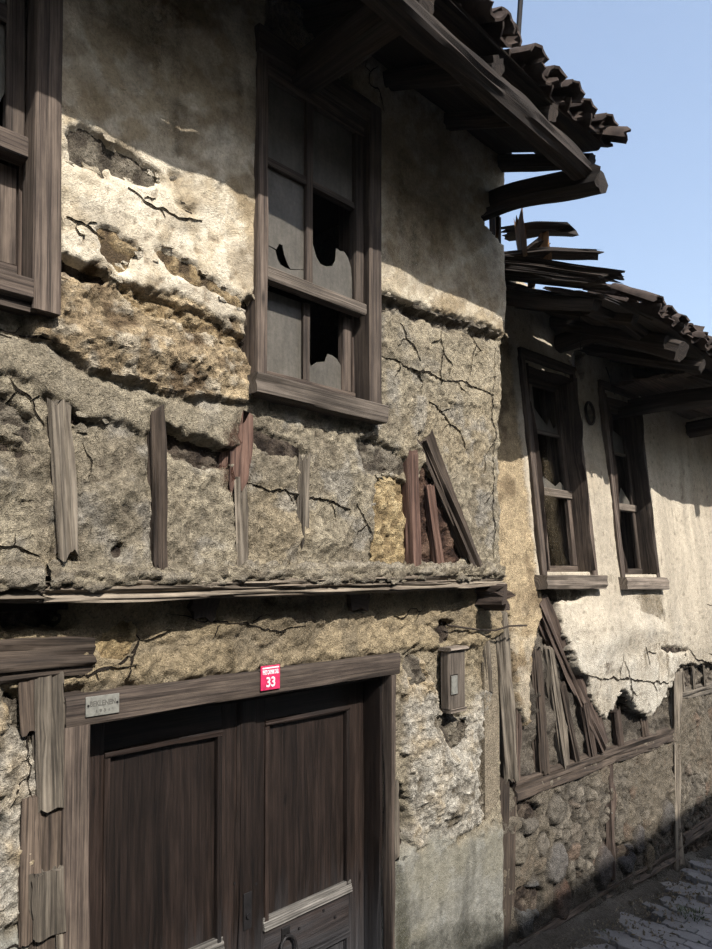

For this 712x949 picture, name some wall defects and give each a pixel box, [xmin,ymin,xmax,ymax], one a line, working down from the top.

spalling [63,128,178,187]
crack [128,187,203,221]
spalling [97,228,255,352]
crack [382,323,497,563]
crack [72,612,306,683]
crack [586,647,712,702]
spalling [677,664,712,688]
spalling [2,693,20,731]
spalling [607,691,632,719]